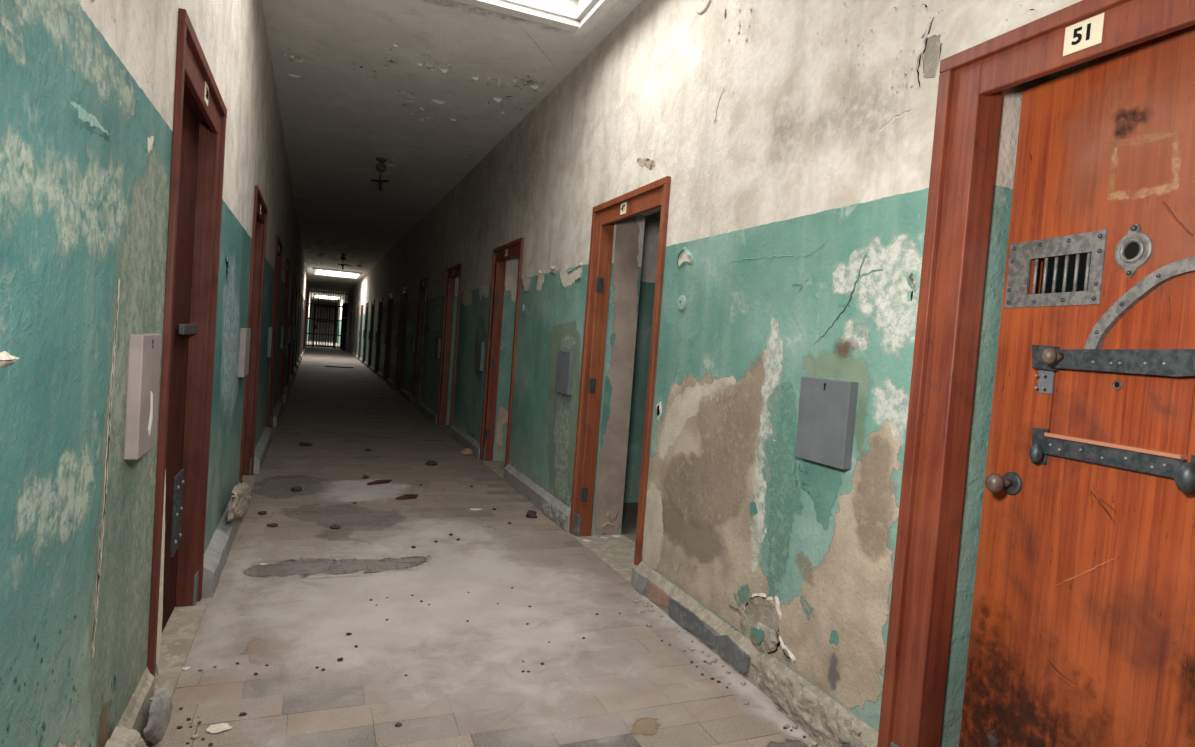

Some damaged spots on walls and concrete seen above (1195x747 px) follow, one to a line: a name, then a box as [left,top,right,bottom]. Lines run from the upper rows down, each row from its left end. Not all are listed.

peeling [0,0,133,116]
flaking render [891,0,946,92]
peeling [67,99,111,142]
peeling [0,129,131,254]
peeling [506,255,583,302]
peeling [677,247,694,270]
crack [812,254,883,345]
crack [905,291,913,301]
flaking render [582,216,640,542]
flaking render [495,406,509,451]
flaking render [646,349,901,710]
flaking render [36,662,148,747]